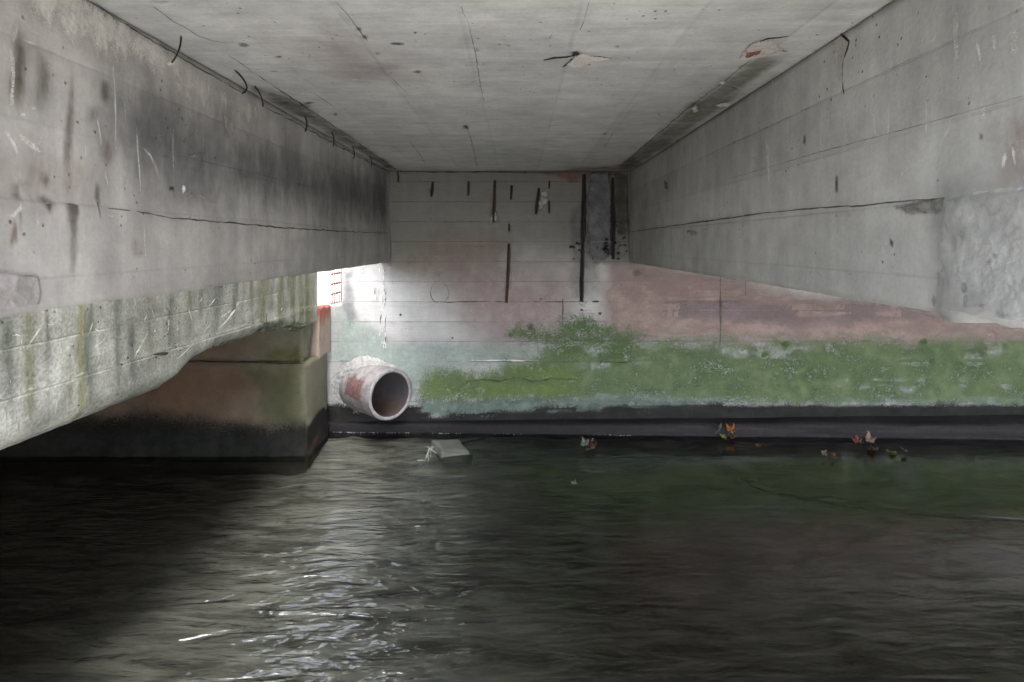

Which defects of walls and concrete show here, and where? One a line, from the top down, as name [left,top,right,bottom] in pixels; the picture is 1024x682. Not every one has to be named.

spalling [544,52,610,68]
spalling [737,36,790,60]
damp [131,107,206,182]
damp [236,93,391,218]
crack [96,3,940,234]
spalling [901,198,944,213]
damp [0,305,1024,462]